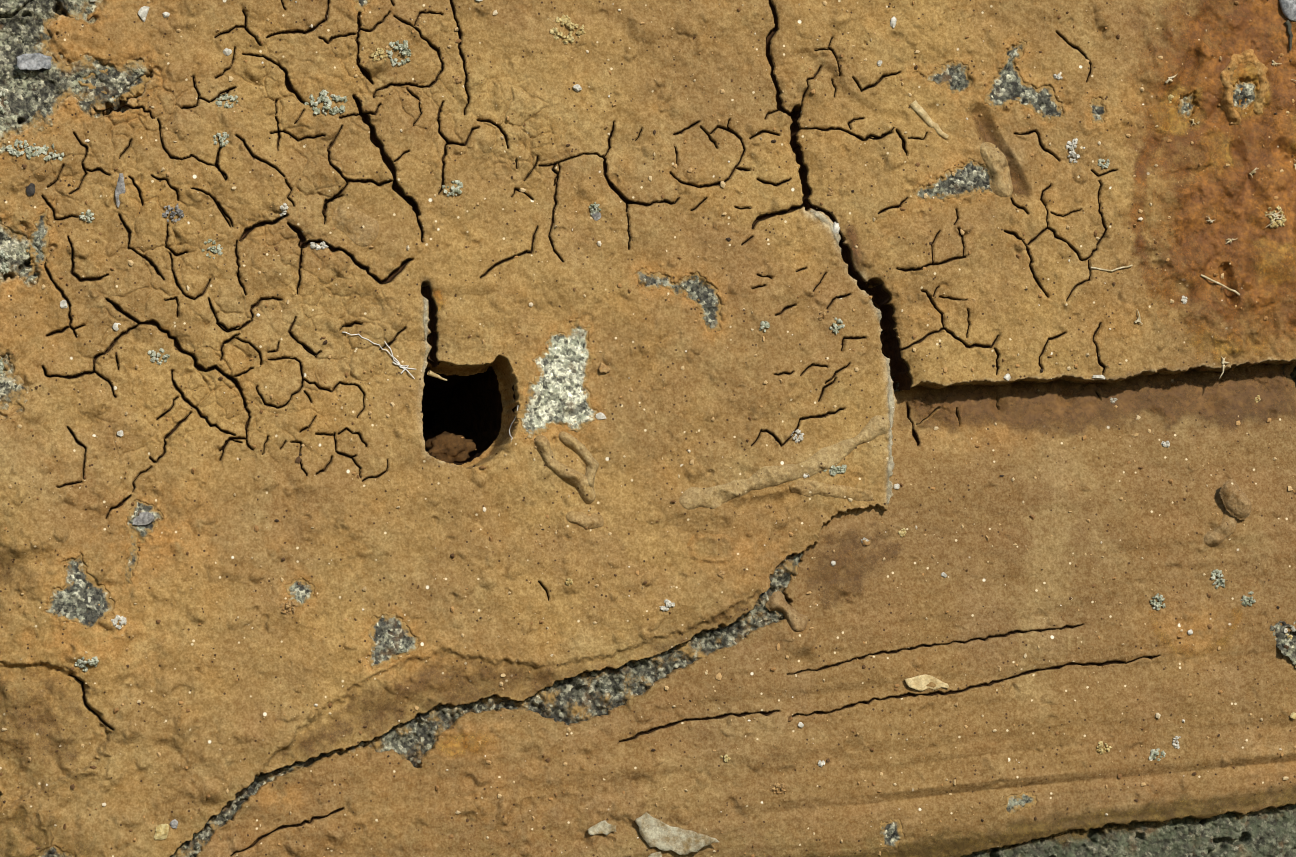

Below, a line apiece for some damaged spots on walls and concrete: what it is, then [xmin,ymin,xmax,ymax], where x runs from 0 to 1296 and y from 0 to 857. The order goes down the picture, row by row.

peeling [16,53,52,70]
spalling [984,41,1064,123]
spalling [912,159,994,202]
crack [1004,131,1116,302]
crack [42,0,999,519]
spalling [514,319,598,439]
crack [1038,323,1105,397]
spalling [44,554,114,628]
spalling [367,613,421,669]
crack [794,624,1083,674]
crack [619,656,1157,742]
crack [231,808,343,856]